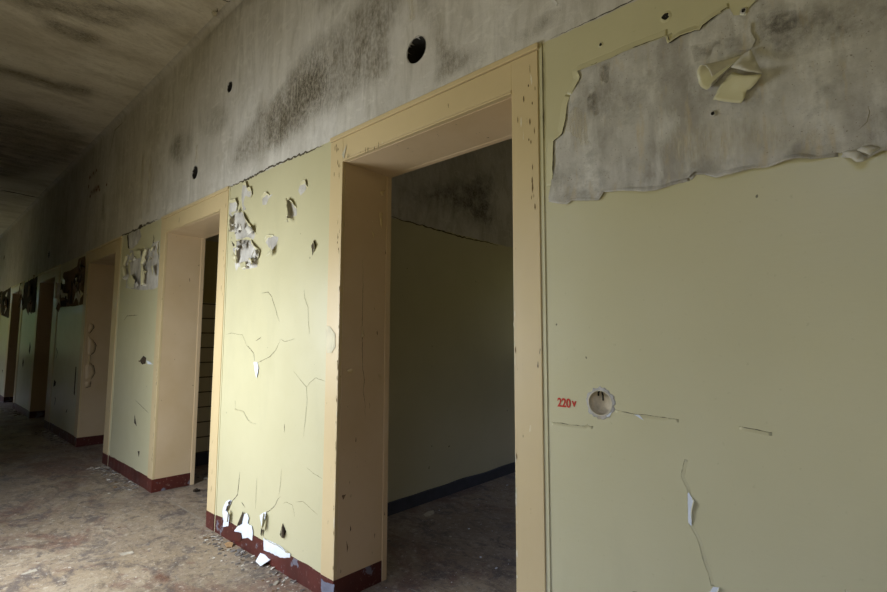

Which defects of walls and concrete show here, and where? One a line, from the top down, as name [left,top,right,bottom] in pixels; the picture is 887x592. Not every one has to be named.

peeling [547,0,887,204]
peeling [55,256,86,312]
peeling [121,224,160,290]
peeling [223,182,279,270]
peeling [285,180,308,222]
crack [229,294,310,378]
peeling [222,474,291,558]
crack [681,459,720,592]